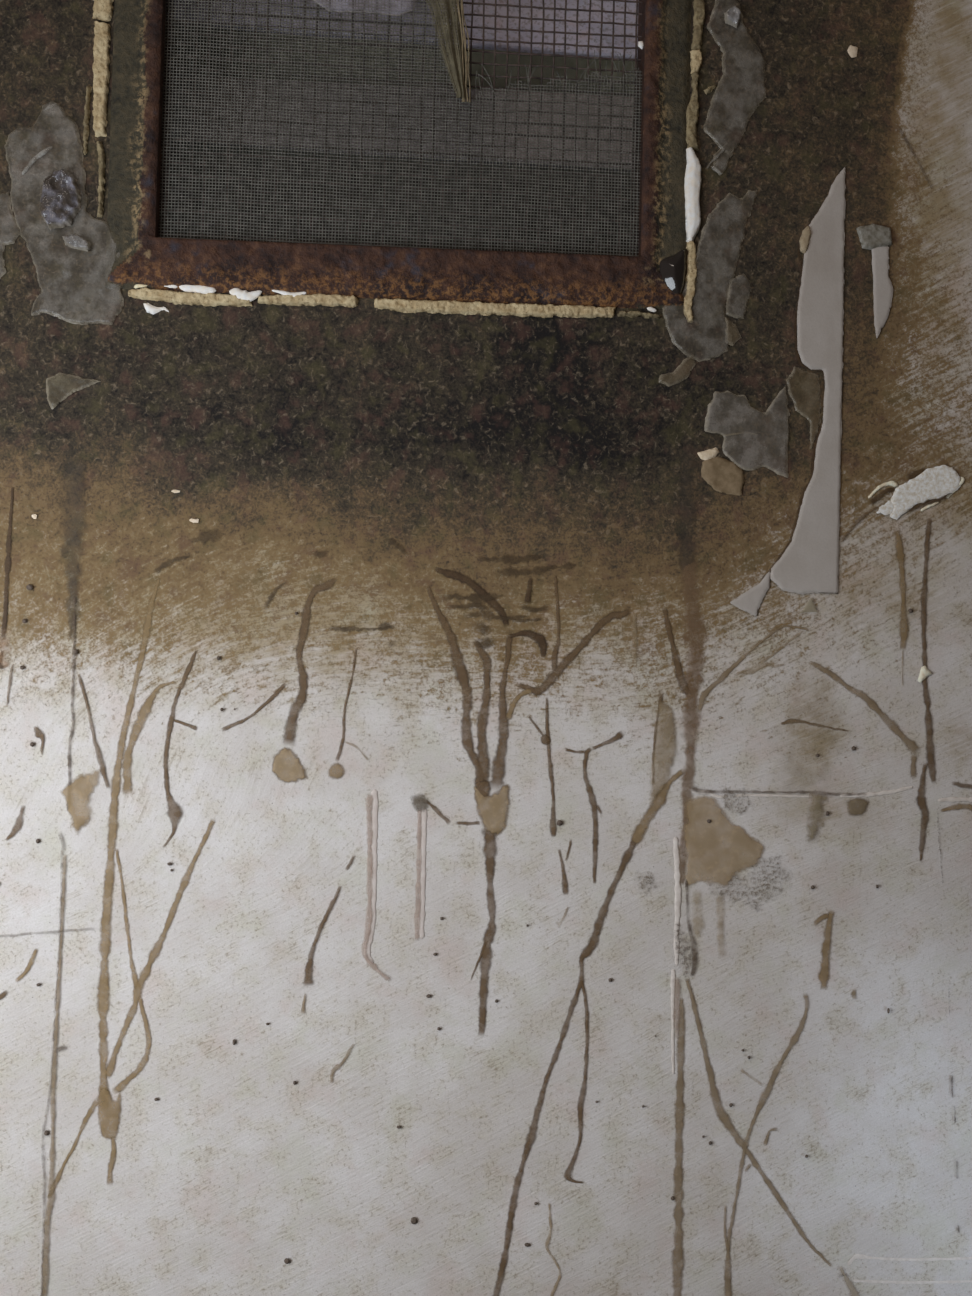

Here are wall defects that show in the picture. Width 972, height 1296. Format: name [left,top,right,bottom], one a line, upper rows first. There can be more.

peeling [83,86,92,155]
peeling [730,167,965,616]